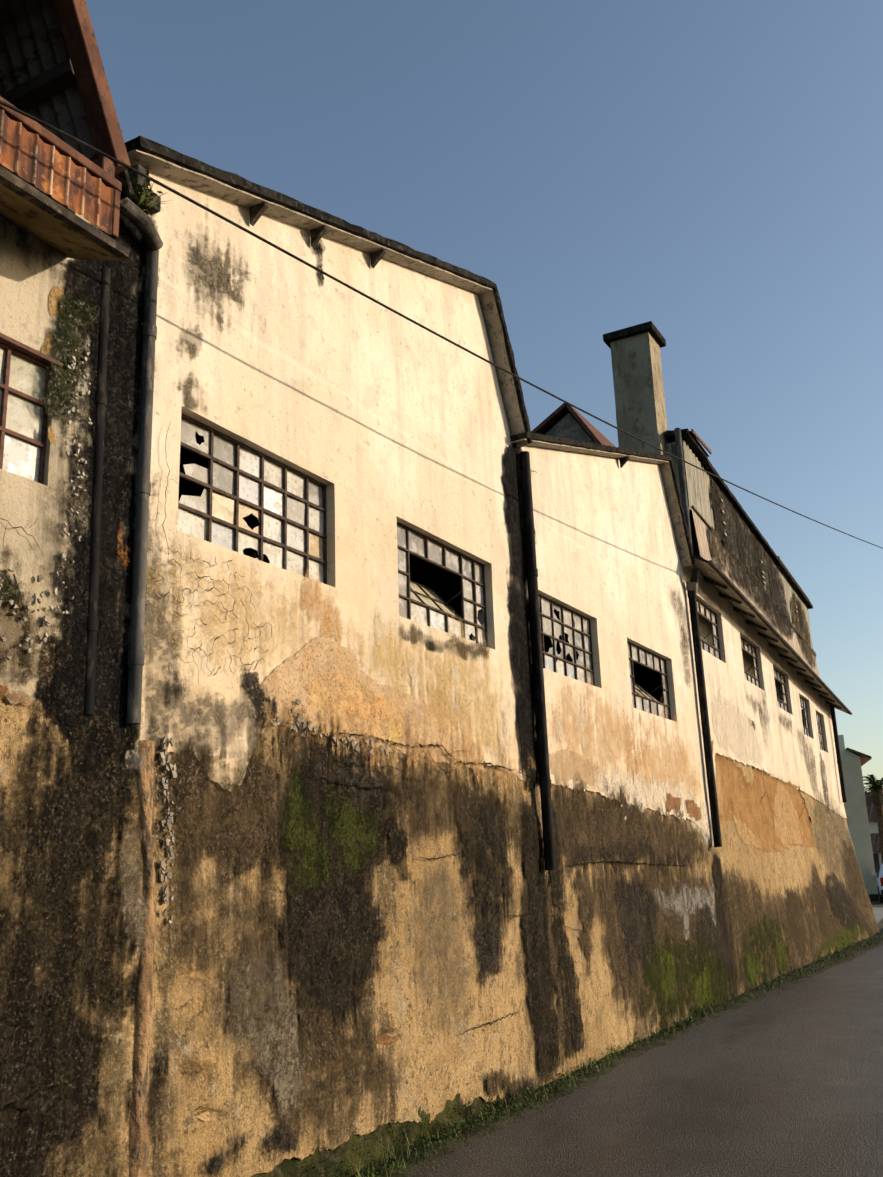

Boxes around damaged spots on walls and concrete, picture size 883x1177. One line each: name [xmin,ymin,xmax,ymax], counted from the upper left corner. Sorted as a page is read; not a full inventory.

spalling [49,286,64,316]
mould [187,233,250,330]
flaking render [0,552,74,660]
flaking render [62,344,93,542]
crack [151,422,272,684]
water stain [504,445,517,514]
mould [710,476,816,669]
water stain [0,549,142,1177]
mould [243,668,419,1054]
peeling [250,637,485,771]
water stain [361,617,595,1081]
water stain [779,715,829,813]